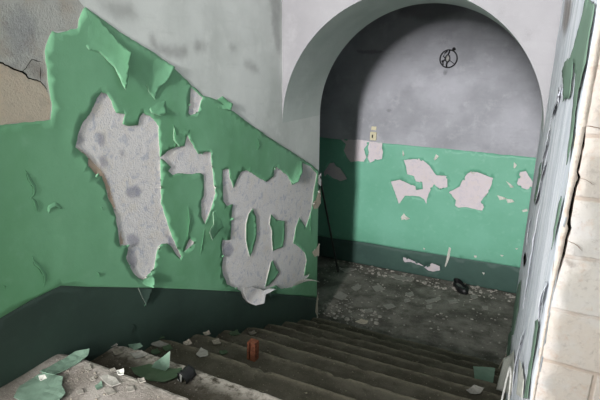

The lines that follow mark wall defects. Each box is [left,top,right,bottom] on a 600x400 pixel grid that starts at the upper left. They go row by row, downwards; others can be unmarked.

crack [0,59,48,92]
flaking render [0,0,132,125]
peeling [342,139,383,162]
peeling [76,58,347,305]
peeling [391,152,493,211]
peeling [506,163,533,189]
peeling [403,247,451,272]